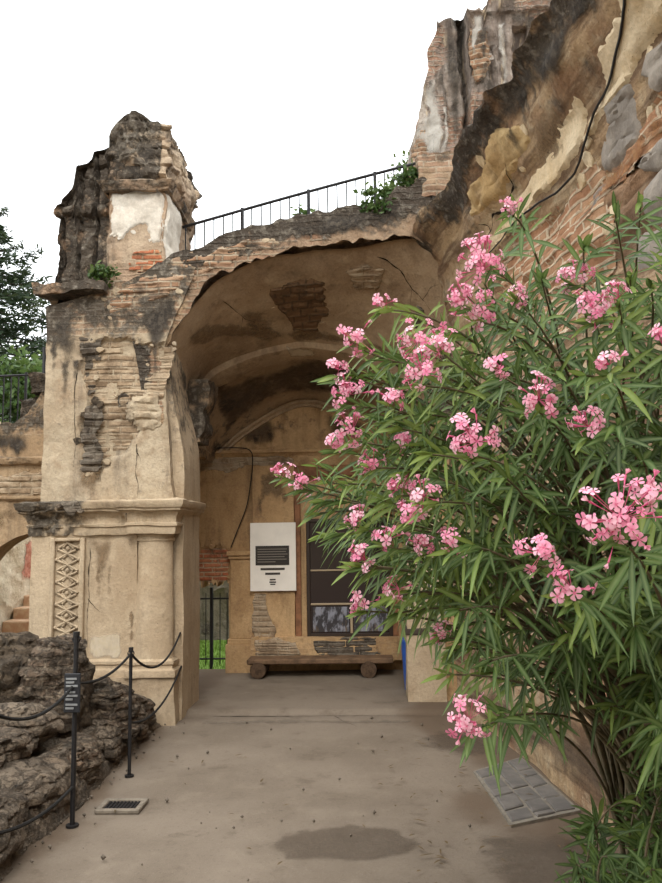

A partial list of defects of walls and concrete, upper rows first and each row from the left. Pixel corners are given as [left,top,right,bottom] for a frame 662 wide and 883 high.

flaking render [406,120,434,188]
crack [479,164,514,245]
flaking render [467,0,662,357]
spalling [73,191,294,479]
spalling [266,278,329,332]
crack [378,257,436,311]
water stain [332,421,363,436]
flaking render [0,466,42,496]